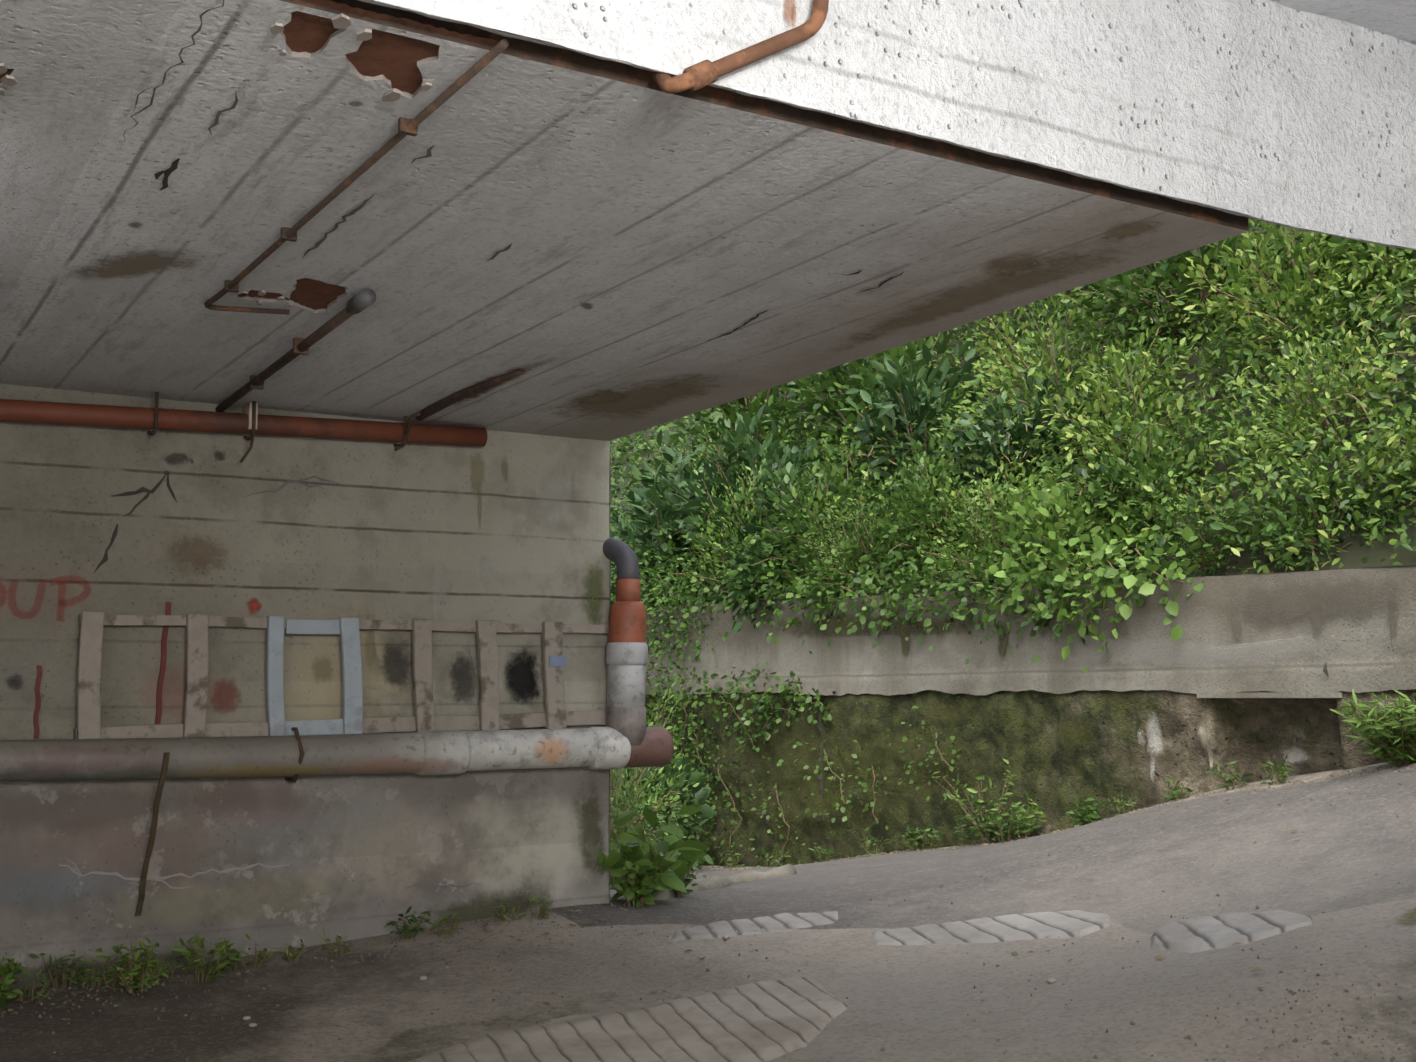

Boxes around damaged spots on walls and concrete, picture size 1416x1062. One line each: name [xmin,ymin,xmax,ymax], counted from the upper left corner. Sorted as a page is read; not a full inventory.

spalling [0,63,18,94]
crack [121,0,224,143]
spalling [270,0,498,102]
crack [208,92,238,135]
crack [154,158,180,191]
damp [77,254,187,278]
spalling [237,278,348,313]
damp [573,377,705,414]
crack [94,472,177,573]
damp [385,648,410,684]
damp [453,658,474,699]
damp [506,651,539,702]